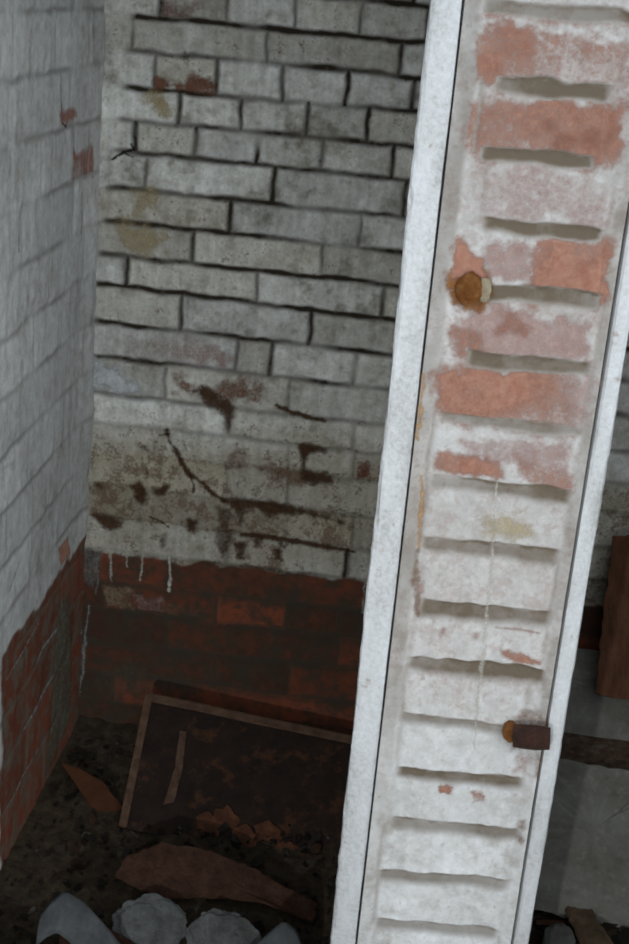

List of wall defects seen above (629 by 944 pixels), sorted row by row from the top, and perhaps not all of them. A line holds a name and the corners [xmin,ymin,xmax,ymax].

peeling [477,15,628,85]
peeling [467,100,627,172]
rust [446,272,486,312]
peeling [451,237,615,305]
peeling [430,303,591,422]
leakage [275,404,326,422]
crack [159,428,226,502]
peeling [435,442,571,489]
leakage [218,509,245,554]